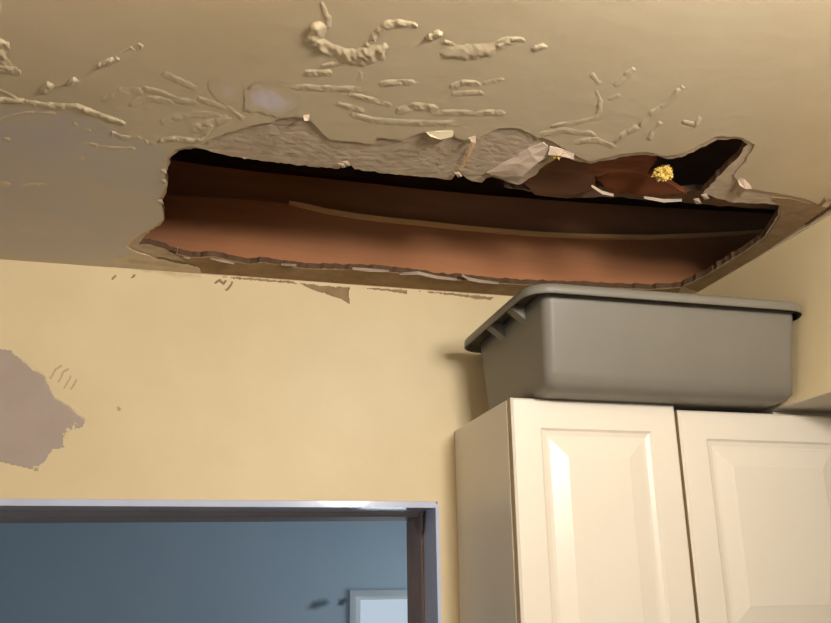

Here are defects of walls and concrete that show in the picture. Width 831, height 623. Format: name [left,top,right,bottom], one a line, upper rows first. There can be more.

spalling [0,103,831,304]
peeling [0,349,89,472]